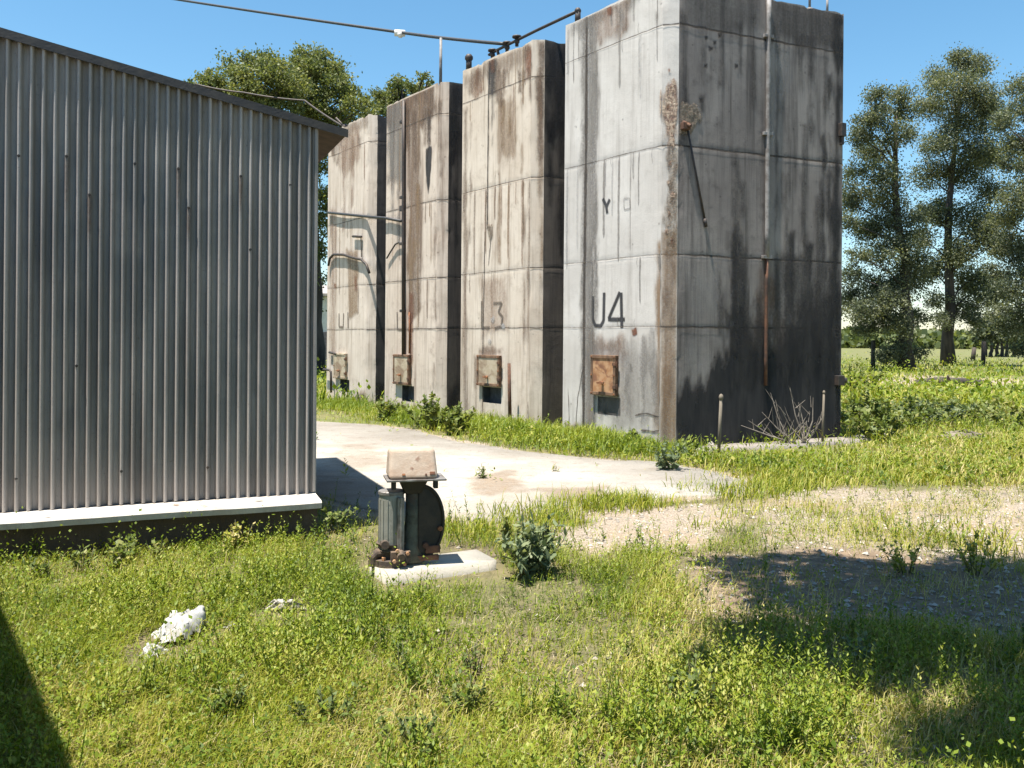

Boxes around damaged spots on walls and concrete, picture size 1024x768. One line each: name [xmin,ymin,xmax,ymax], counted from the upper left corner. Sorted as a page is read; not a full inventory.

water stain [387,80,470,318]
water stain [483,10,620,427]
rust [656,232,676,447]
water stain [676,5,844,448]